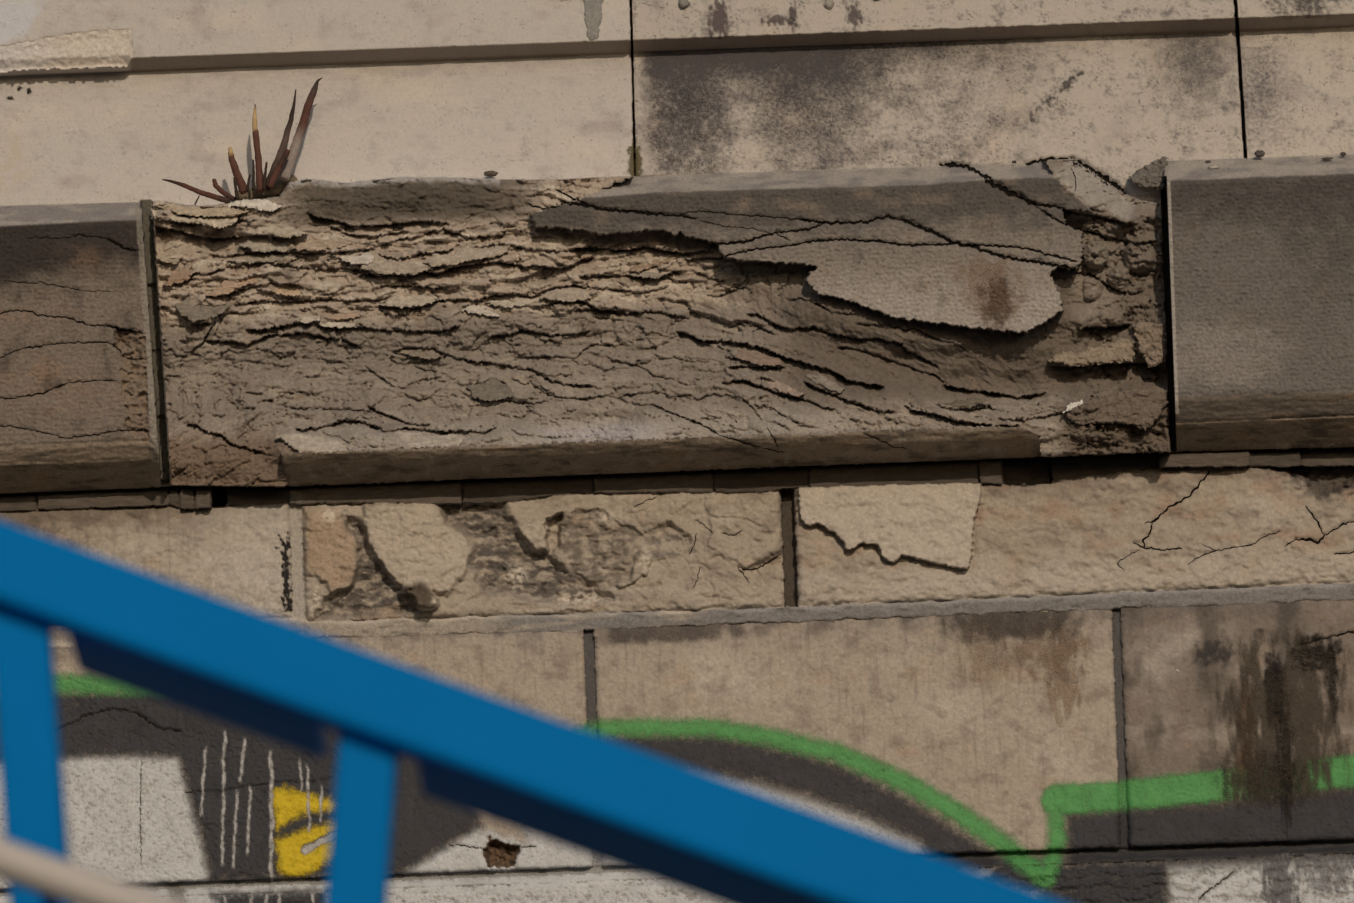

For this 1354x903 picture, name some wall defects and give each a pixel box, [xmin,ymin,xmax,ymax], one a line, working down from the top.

spalling [0,29,135,73]
water stain [644,0,1002,169]
water stain [1030,71,1084,123]
crack [28,233,136,251]
crack [525,156,1126,271]
crack [0,280,149,439]
spalling [114,160,1171,488]
spalling [302,505,440,622]
spalling [440,503,697,609]
peeling [798,483,982,570]
crack [1117,471,1354,570]
water stain [1197,628,1348,837]